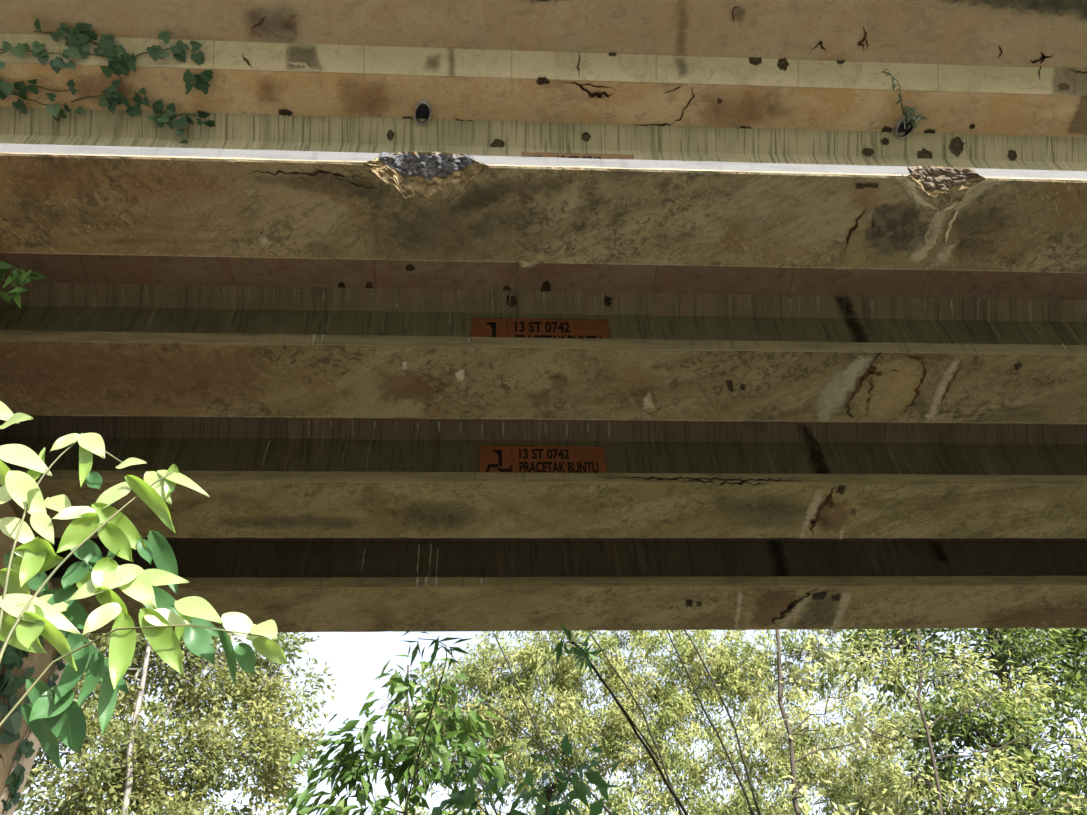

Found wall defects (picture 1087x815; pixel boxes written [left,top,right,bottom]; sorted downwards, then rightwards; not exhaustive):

crack [556,52,615,98]
crack [633,86,695,126]
crack [247,170,376,189]
spalling [307,130,540,207]
spalling [907,136,986,198]
leakage [836,296,868,342]
leakage [926,360,964,420]
leakage [804,427,830,474]
crack [603,477,856,539]
crack [771,589,841,627]